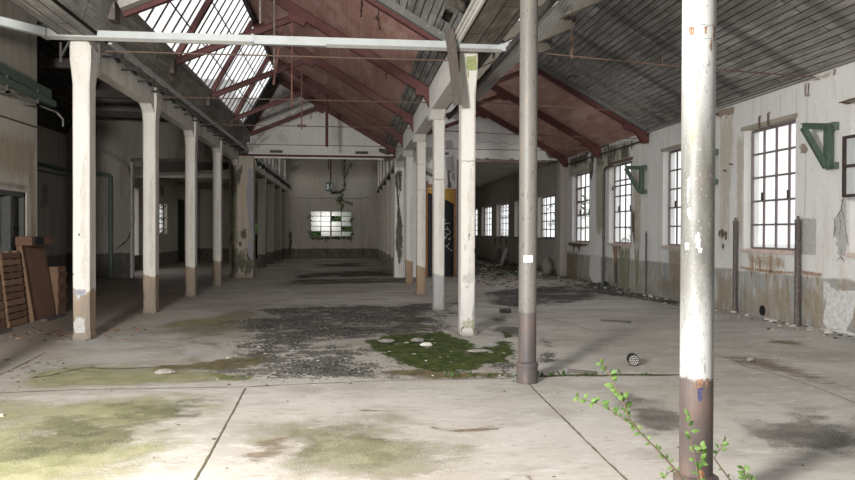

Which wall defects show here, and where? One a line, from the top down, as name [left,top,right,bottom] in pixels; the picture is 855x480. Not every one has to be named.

crack [833,197,848,262]
damp [653,248,680,294]
corrosion [741,253,822,280]
flaking render [820,281,855,336]